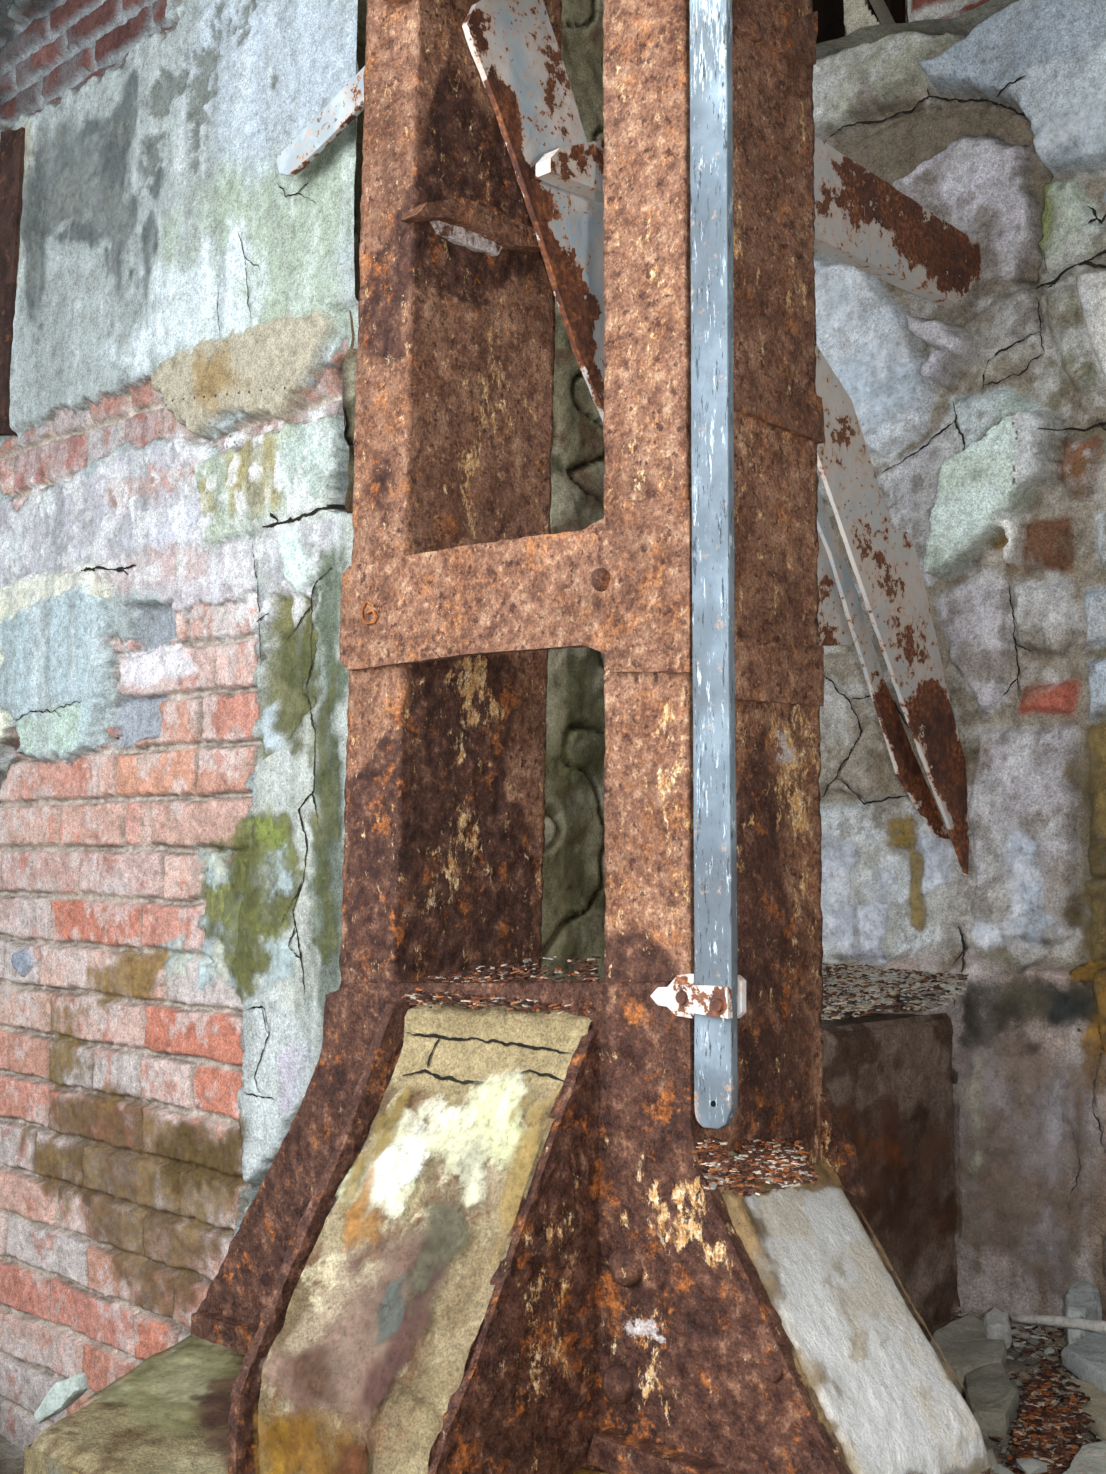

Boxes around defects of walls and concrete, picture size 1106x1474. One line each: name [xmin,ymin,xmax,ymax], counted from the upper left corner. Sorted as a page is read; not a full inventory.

spalling [0,0,176,129]
water stain [20,70,164,313]
crack [825,76,1026,140]
spalling [0,311,348,510]
crack [252,504,346,990]
spalling [0,594,263,1452]
water stain [87,937,231,1005]
crack [403,1032,569,1085]
water stain [20,1007,246,1318]
corrosion [500,1090,560,1227]
corrosion [257,1169,446,1474]
corrosion [792,1353,838,1438]